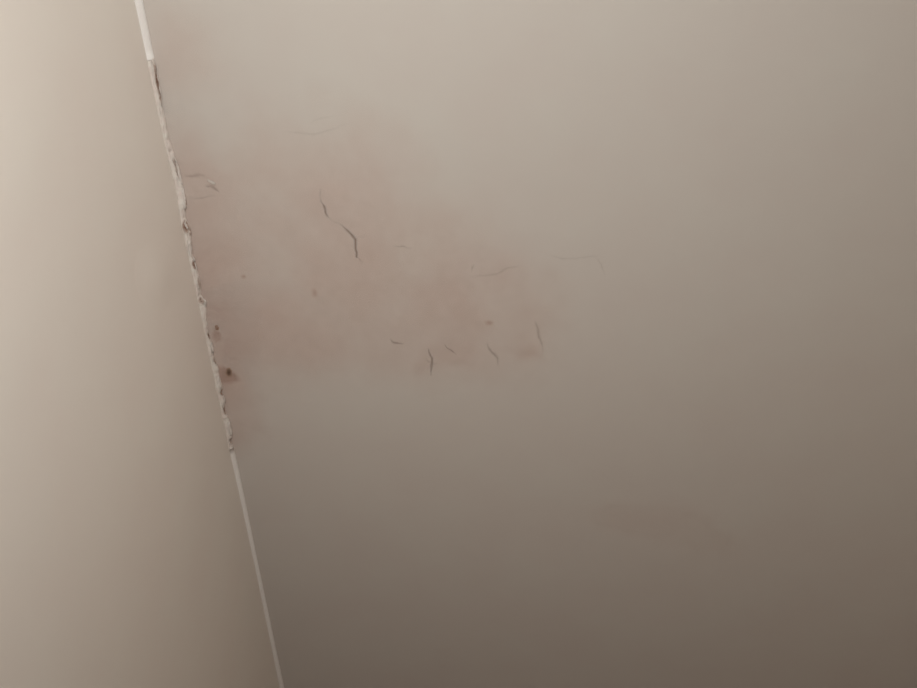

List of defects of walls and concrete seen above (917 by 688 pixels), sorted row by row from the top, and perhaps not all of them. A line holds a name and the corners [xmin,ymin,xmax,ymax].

crack [319,190,358,257]